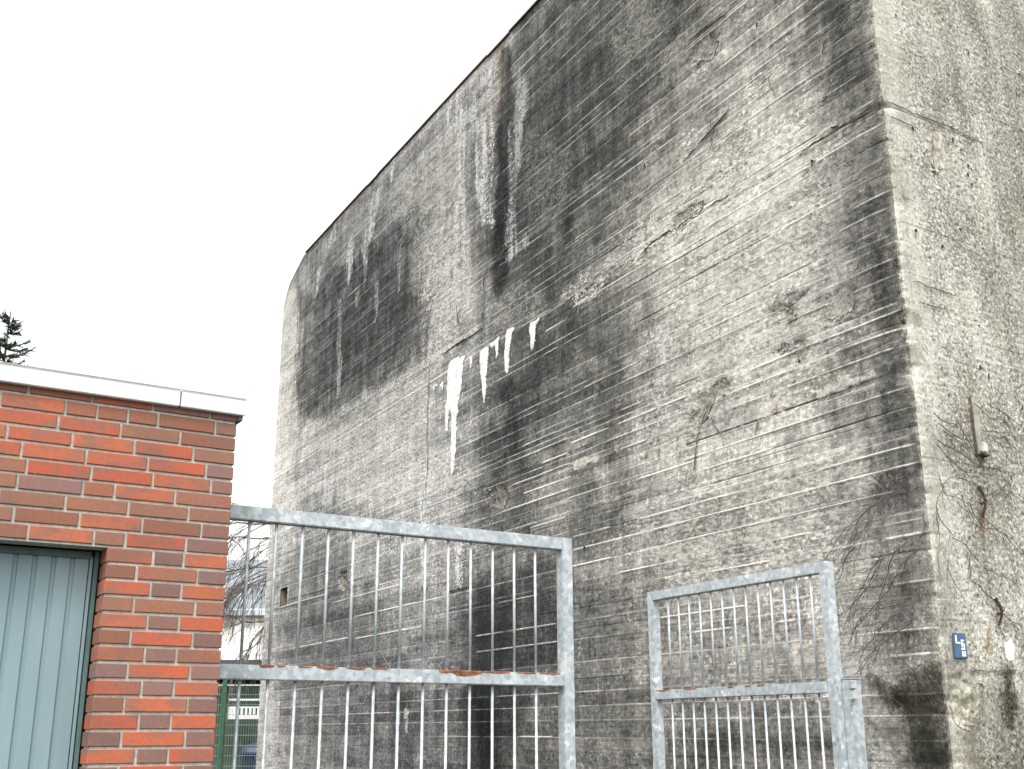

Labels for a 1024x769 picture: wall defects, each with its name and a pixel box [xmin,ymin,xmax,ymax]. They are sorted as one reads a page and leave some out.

leakage [446,59,498,251]
leakage [346,188,380,282]
crack [693,404,724,485]